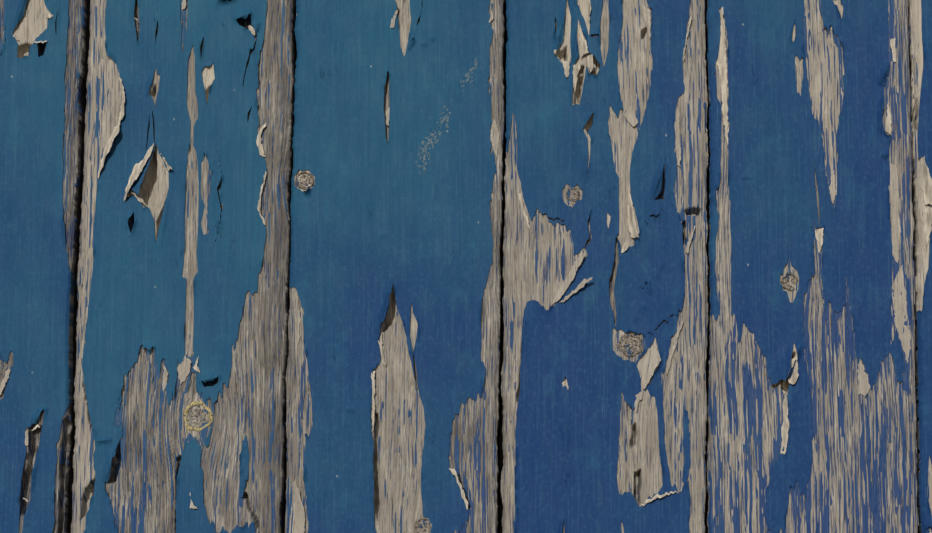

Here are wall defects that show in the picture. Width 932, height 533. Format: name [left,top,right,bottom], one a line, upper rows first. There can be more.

peeling [0,0,57,58]
peeling [390,0,411,56]
peeling [554,0,653,254]
peeling [0,351,13,399]
peeling [52,0,315,533]
peeling [371,286,432,533]
peeling [448,0,593,533]
peeling [613,0,932,533]